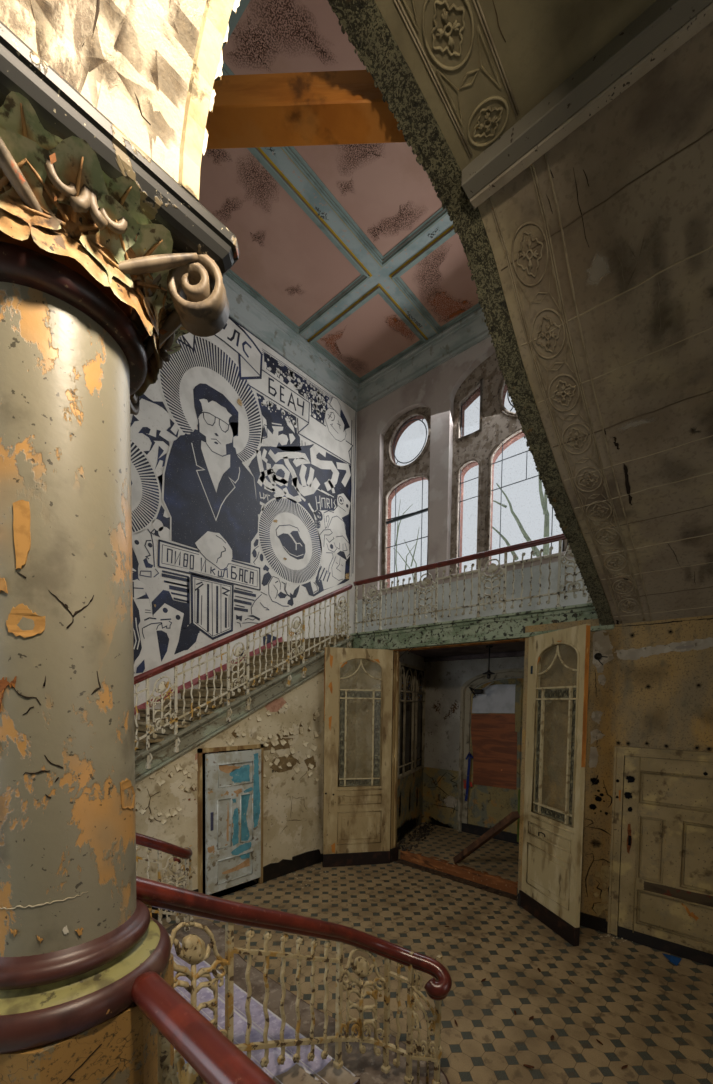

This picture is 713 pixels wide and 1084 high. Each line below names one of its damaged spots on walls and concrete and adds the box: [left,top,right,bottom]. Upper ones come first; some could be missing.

crack [82,0,100,47]
spalling [209,24,229,112]
crack [134,92,151,126]
peeling [329,1,713,697]
peeling [13,500,31,570]
peeling [6,603,45,638]
crack [49,591,94,628]
peeling [0,676,16,712]
crack [11,676,46,715]
peeling [120,697,332,824]